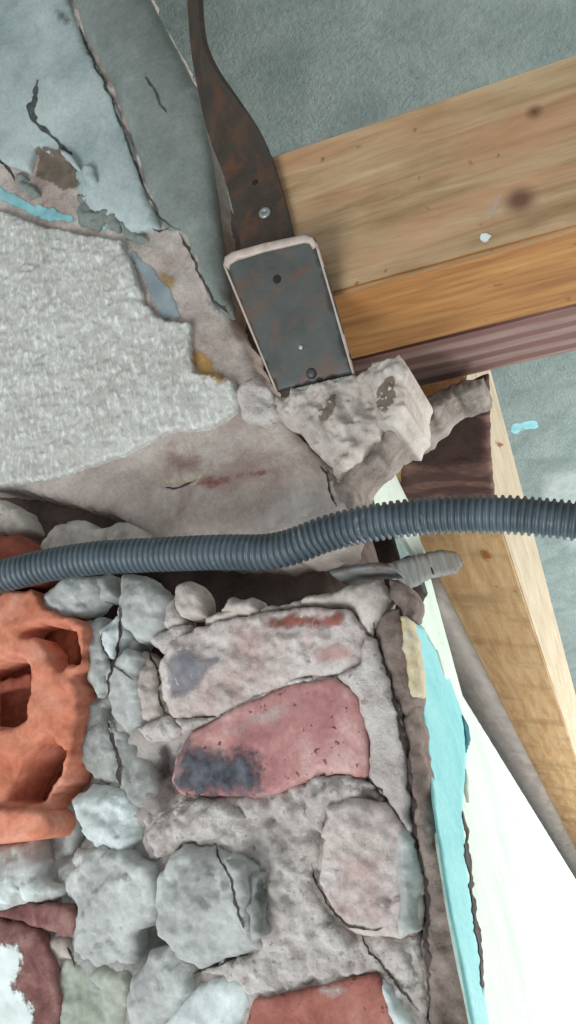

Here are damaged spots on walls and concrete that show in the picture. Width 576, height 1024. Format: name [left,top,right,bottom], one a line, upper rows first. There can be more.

crack [26,79,77,171]
spalling [0,146,180,319]
crack [75,16,232,319]
crack [100,606,170,716]
crack [213,842,244,928]
crack [311,623,432,1023]
peeling [416,624,489,1024]